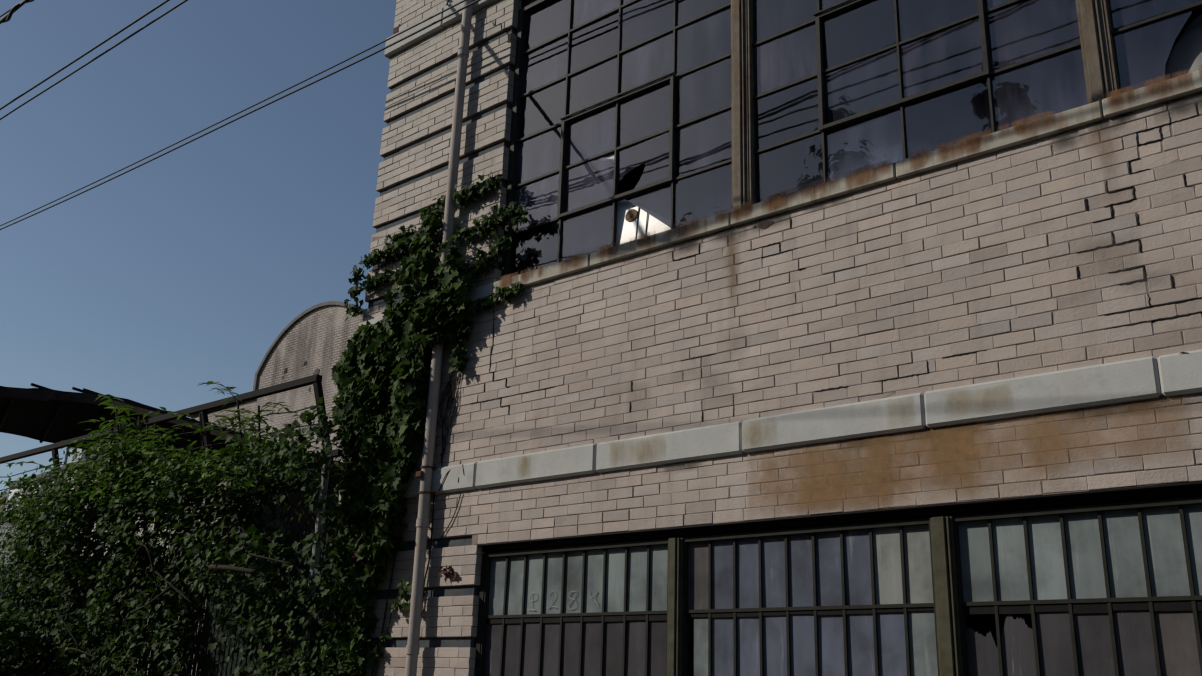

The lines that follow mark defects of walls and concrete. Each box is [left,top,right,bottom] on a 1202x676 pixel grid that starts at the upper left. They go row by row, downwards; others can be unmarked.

corrosion [721,181,828,216]
crack [1075,102,1202,330]
crack [472,309,552,415]